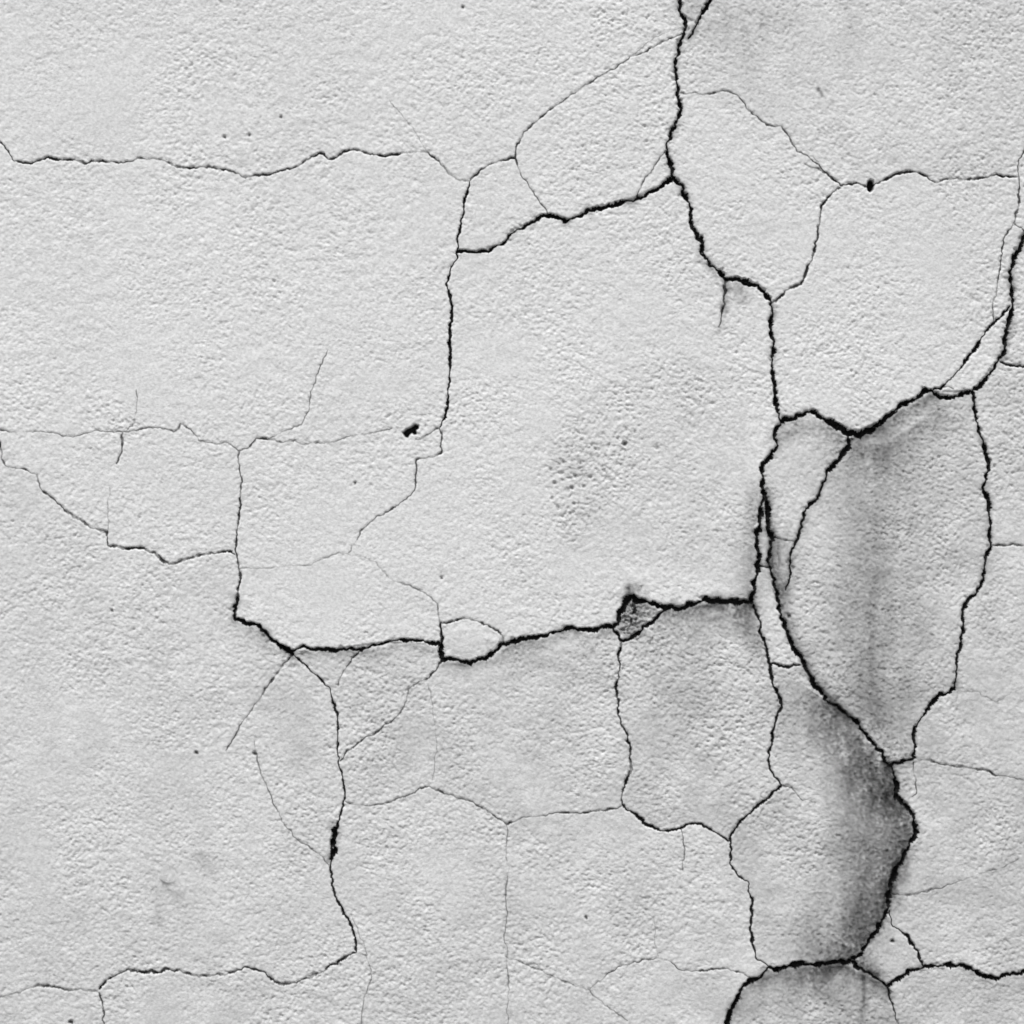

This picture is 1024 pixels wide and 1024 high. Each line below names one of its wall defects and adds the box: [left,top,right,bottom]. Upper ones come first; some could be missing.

crack [0,142,401,178]
crack [34,425,210,464]
crack [39,483,181,565]
crack [210,0,1024,1024]
spalling [618,603,654,636]
crack [99,967,192,1023]